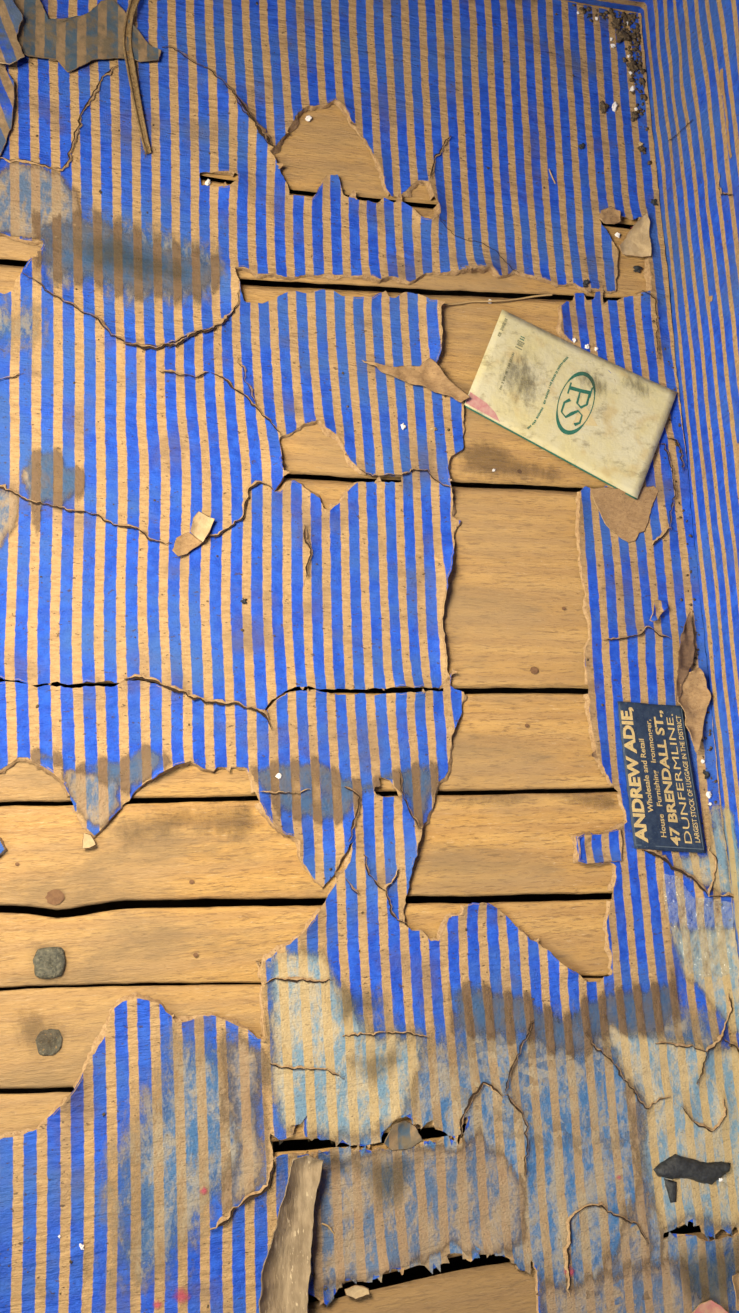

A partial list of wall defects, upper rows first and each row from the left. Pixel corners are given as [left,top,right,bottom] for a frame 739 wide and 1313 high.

peeling [268,98,441,221]
peeling [234,264,617,348]
peeling [272,418,403,510]
crack [0,484,172,545]
crack [206,480,271,539]
peeling [343,413,466,695]
peeling [650,600,668,622]
crack [124,674,271,728]
peeling [569,492,627,981]
peeling [0,757,353,1139]
peeling [345,1285,370,1299]
peeling [692,1273,739,1313]